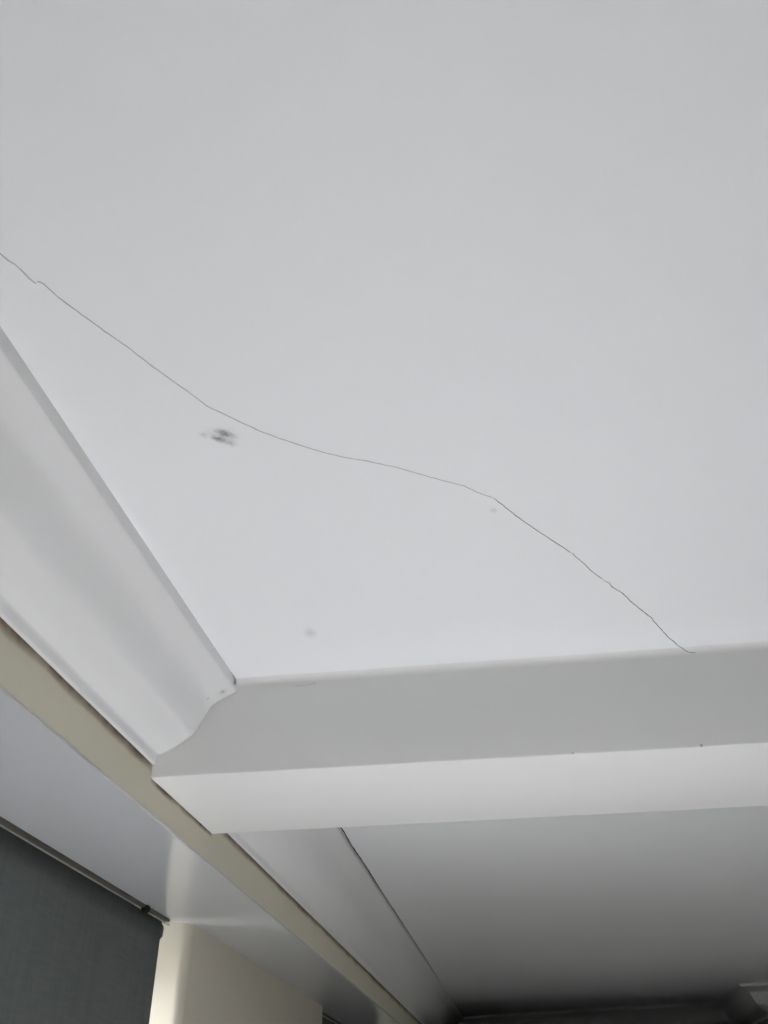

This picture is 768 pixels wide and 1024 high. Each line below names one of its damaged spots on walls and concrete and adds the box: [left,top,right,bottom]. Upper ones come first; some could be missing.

crack [0,253,696,653]